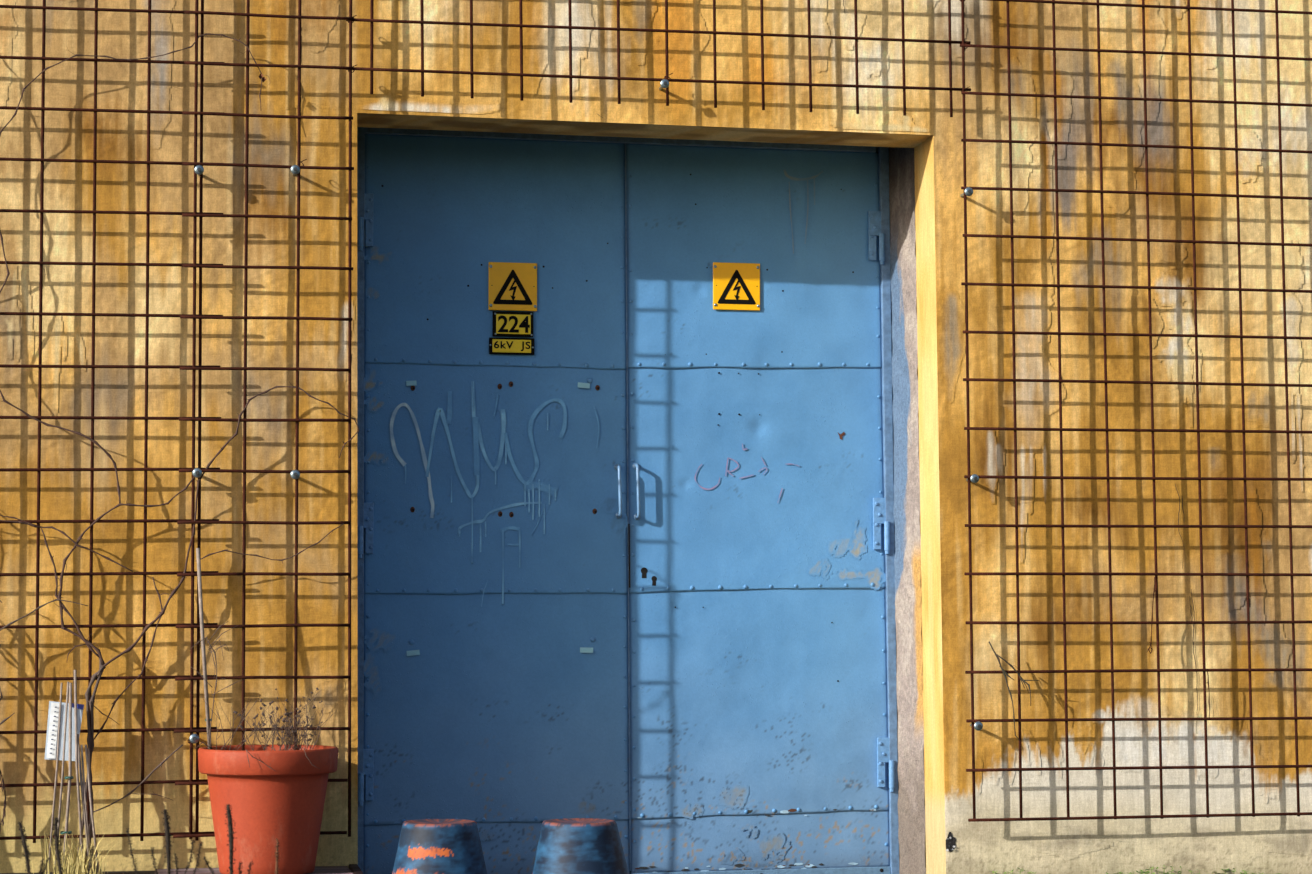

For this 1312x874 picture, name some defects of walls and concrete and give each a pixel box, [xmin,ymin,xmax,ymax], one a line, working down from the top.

corrosion [254,0,339,109]
corrosion [506,0,552,98]
corrosion [655,0,709,79]
corrosion [1131,0,1167,124]
water stain [1170,0,1222,69]
corrosion [1034,51,1073,297]
water stain [1098,56,1144,219]
water stain [1232,129,1265,183]
water stain [1127,293,1163,348]
peeling [975,725,1064,794]
flaking render [1081,691,1284,804]
flaking render [946,832,956,852]